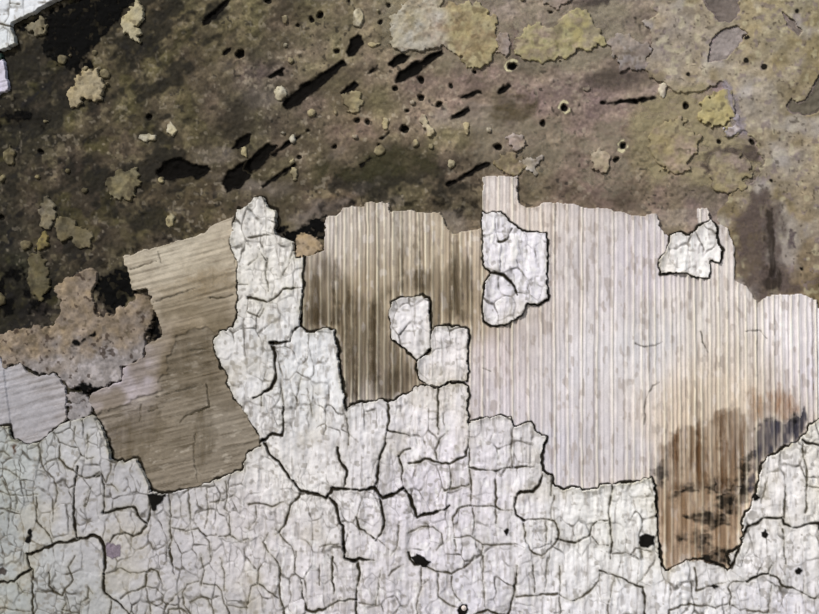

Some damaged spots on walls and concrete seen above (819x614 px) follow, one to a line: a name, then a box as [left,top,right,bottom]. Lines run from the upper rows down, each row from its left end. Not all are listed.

crack [0,326,653,614]
peeling [0,156,819,614]
crack [668,439,819,614]
leakage [754,409,807,460]